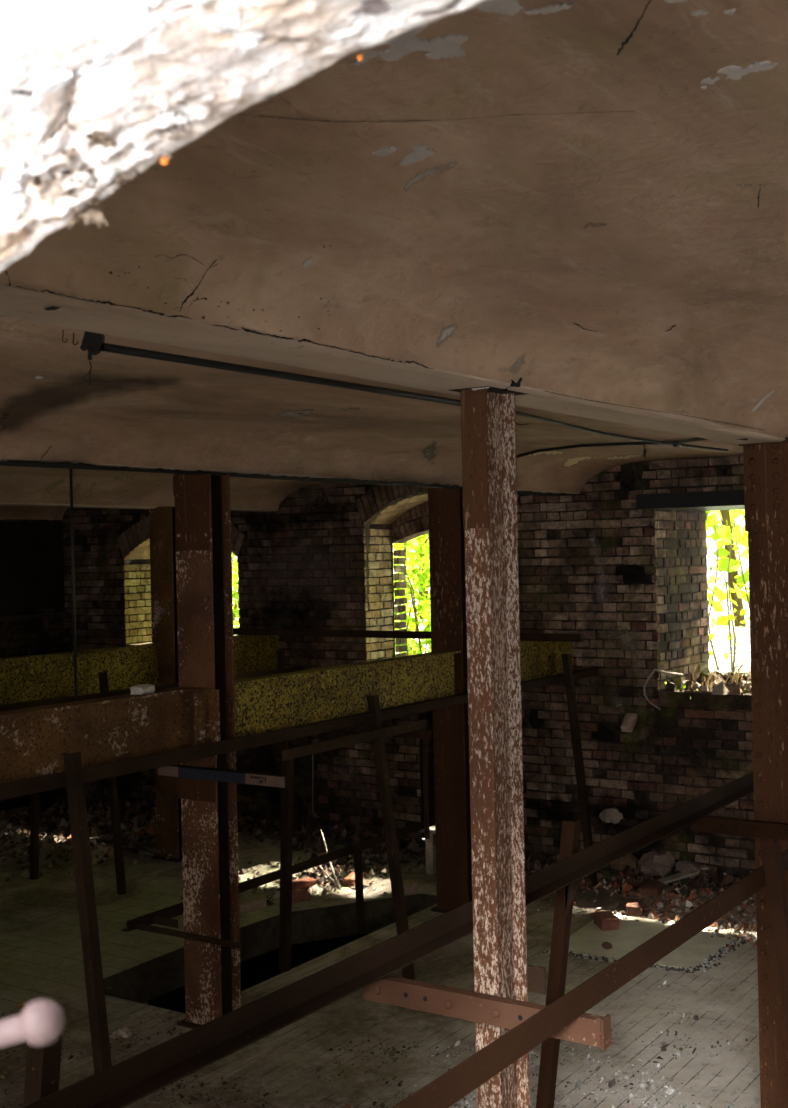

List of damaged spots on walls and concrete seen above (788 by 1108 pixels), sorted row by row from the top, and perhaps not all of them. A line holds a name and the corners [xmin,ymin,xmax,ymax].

peeling [472,0,574,16]
crack [617,0,651,55]
peeling [351,24,469,66]
peeling [700,61,777,90]
crack [0,88,34,96]